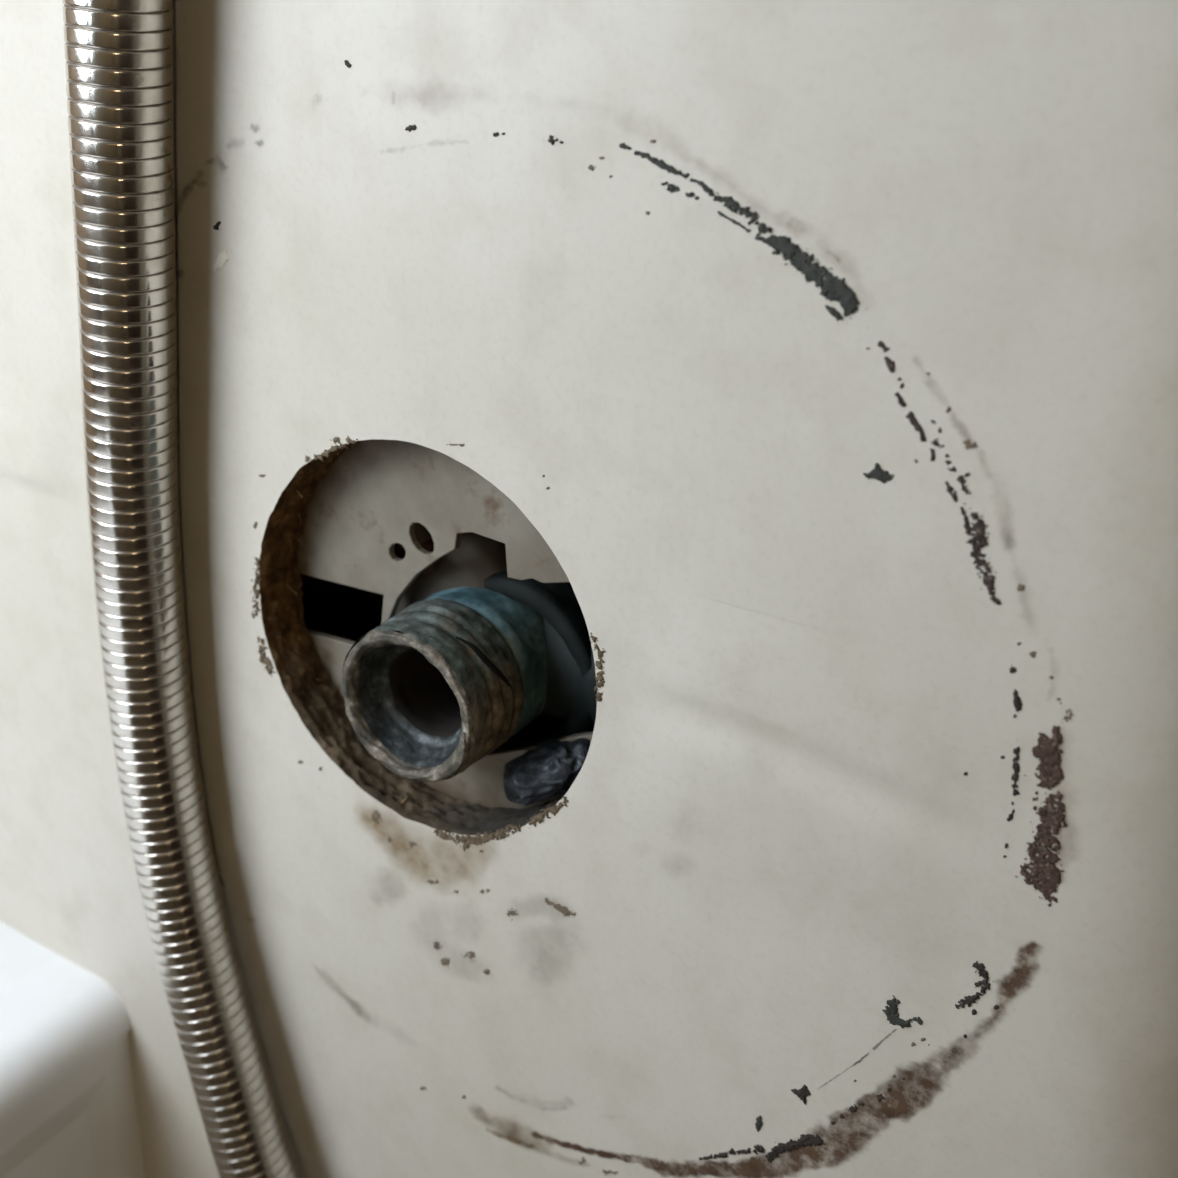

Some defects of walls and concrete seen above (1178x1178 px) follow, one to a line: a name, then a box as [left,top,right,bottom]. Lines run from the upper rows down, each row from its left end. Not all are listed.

peeling [619,143,860,321]
peeling [863,463,894,483]
peeling [877,340,1001,605]
peeling [882,995,923,1028]
peeling [955,961,994,1015]
rust [987,943,1037,1025]
rust [496,1046,963,1178]
peeling [791,1084,811,1105]